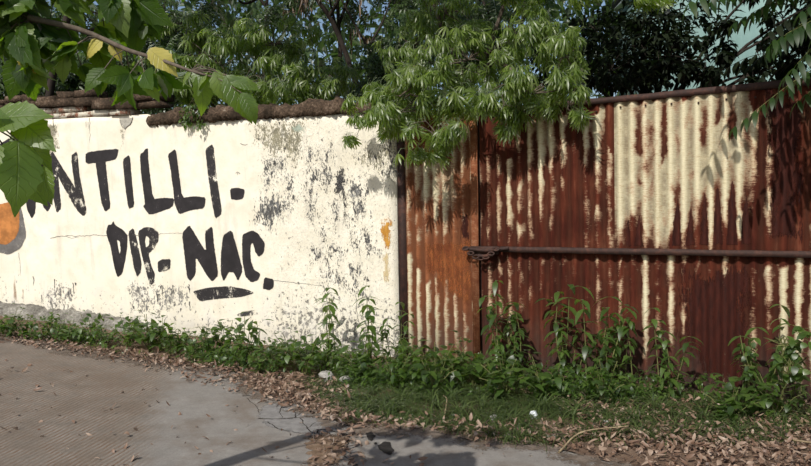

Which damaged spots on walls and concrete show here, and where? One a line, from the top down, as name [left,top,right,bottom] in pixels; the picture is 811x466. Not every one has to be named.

water stain [246,117,308,168]
water stain [349,139,402,189]
corrosion [763,89,809,243]
corrosion [380,219,392,281]
corrosion [460,214,469,239]
corrosion [625,216,644,247]
corrosion [672,181,751,246]
corrosion [674,265,755,392]